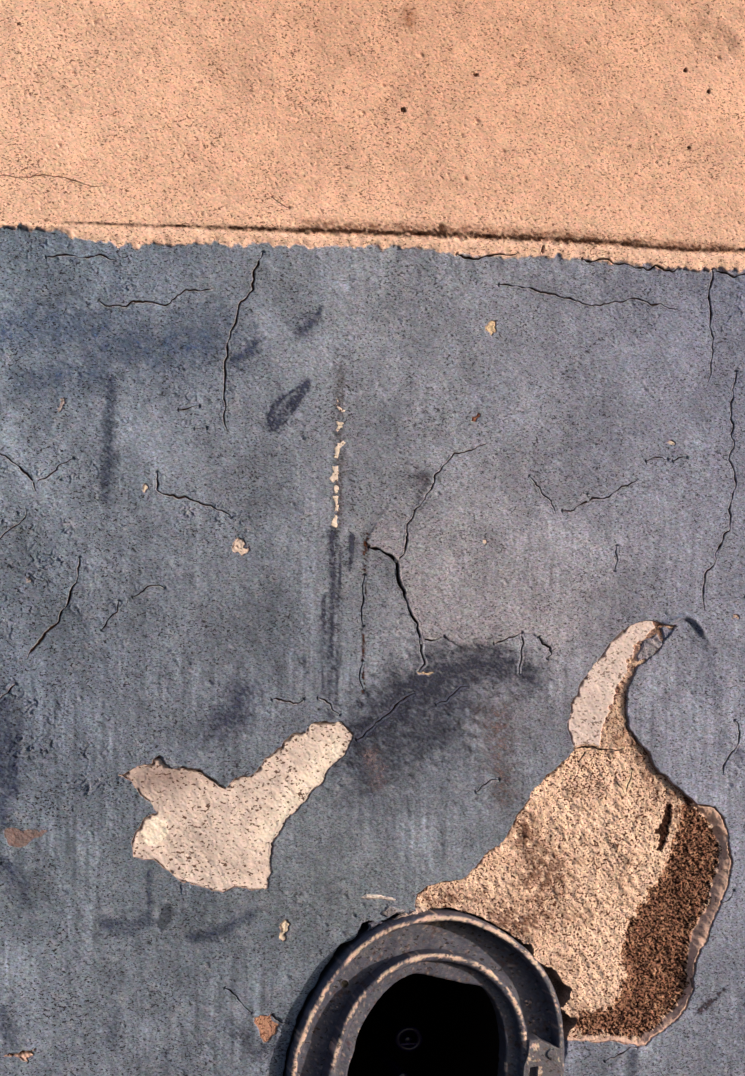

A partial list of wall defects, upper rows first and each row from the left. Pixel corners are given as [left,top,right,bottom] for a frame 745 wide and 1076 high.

crack [98,252,265,432]
damp [267,380,311,432]
crack [456,250,679,312]
crack [700,268,745,610]
damp [321,530,355,690]
crack [356,441,488,742]
damp [349,643,552,793]
crack [494,631,555,674]
peeling [4,828,47,847]
peeling [122,721,353,896]
flaking render [361,621,731,1047]
peeling [254,1014,279,1042]